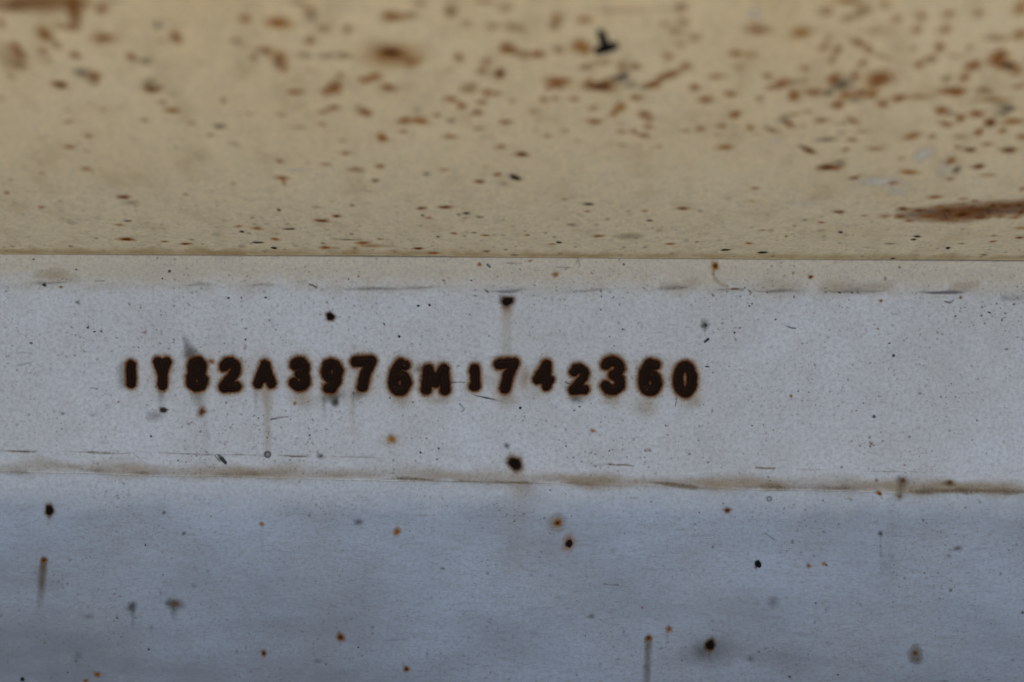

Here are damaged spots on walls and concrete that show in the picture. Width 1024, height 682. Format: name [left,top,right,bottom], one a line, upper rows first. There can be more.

rust [14,0,79,29]
rust [269,19,289,27]
rust [379,48,415,64]
rust [502,44,543,57]
rust [574,41,611,91]
rust [941,37,1022,95]
rust [766,75,819,100]
rust [833,73,920,108]
rust [937,108,983,126]
rust [897,189,1024,239]
rust [507,456,522,472]